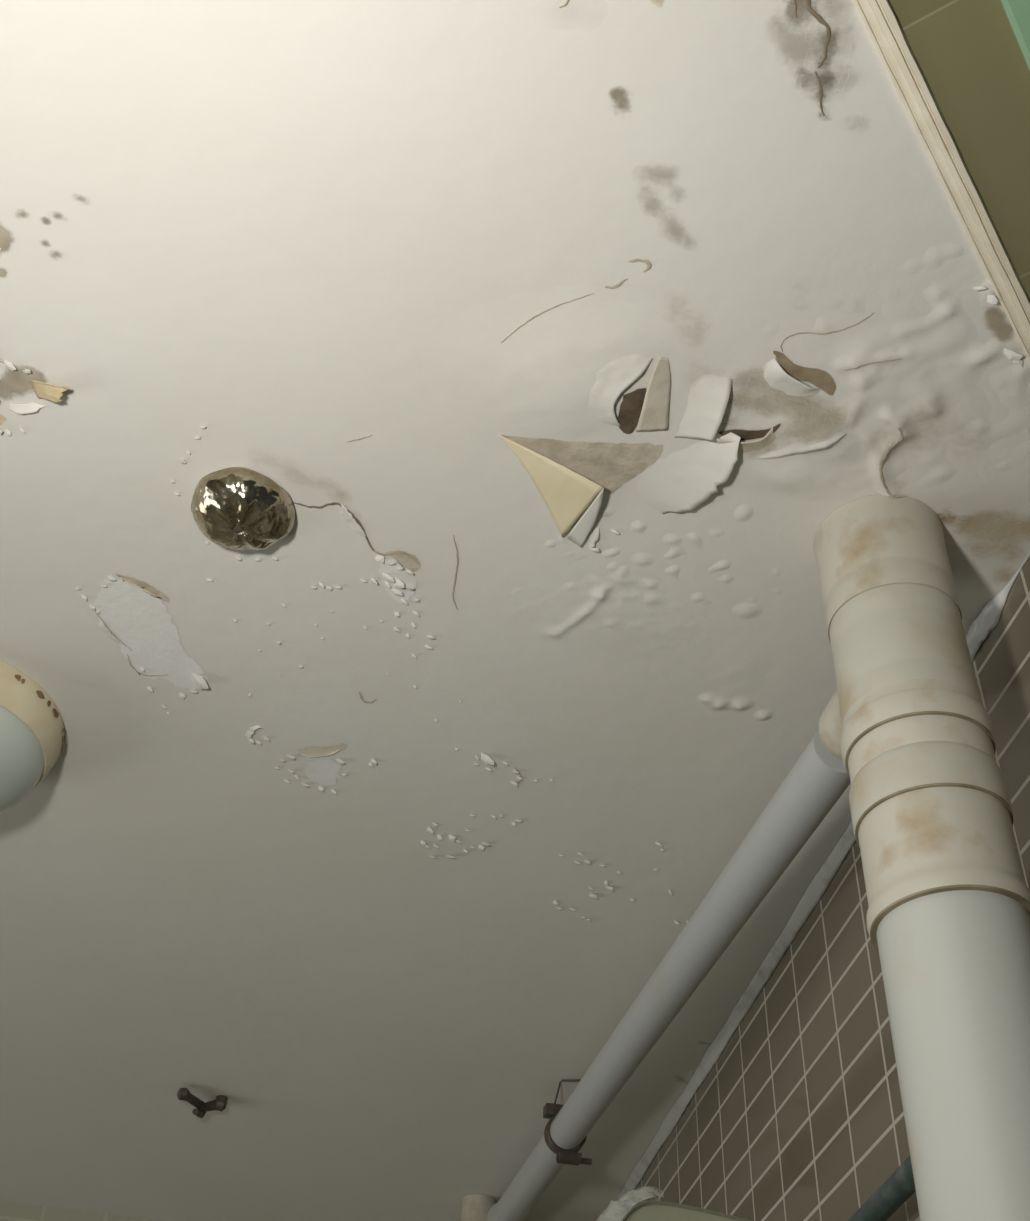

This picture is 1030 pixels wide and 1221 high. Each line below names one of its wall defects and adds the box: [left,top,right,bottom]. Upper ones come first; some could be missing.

crack [650,0,663,8]
damp [787,0,835,115]
damp [611,90,627,107]
peeling [0,226,12,277]
crack [501,258,651,343]
peeling [0,359,68,436]
peeling [499,312,874,553]
crack [292,502,435,658]
crack [451,535,459,610]
peeling [76,574,209,699]
peeling [275,743,347,794]